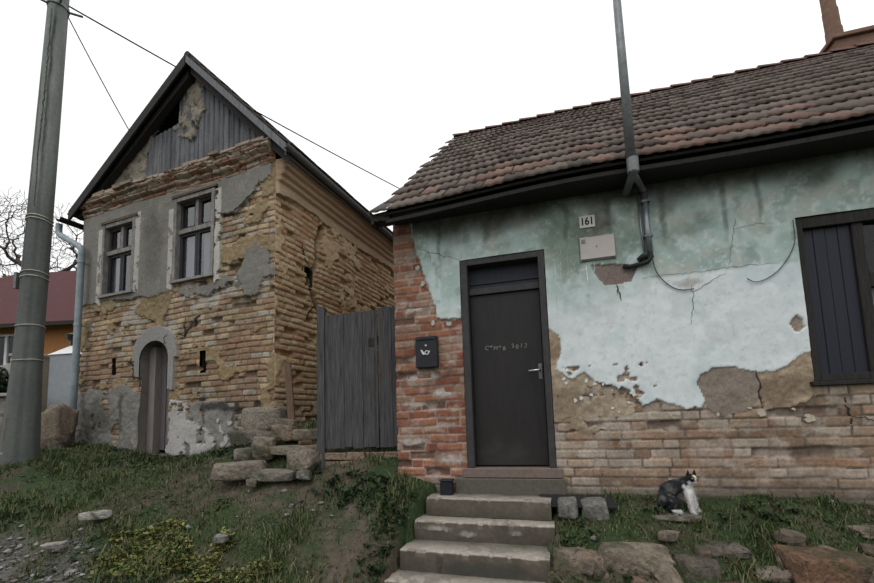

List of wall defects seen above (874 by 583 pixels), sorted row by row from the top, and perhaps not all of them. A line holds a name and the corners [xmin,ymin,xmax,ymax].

spalling [173,79,207,141]
spalling [111,127,159,188]
spalling [592,264,639,286]
crack [646,219,769,323]
spalling [75,162,468,492]
spalling [790,315,805,332]
spalling [549,330,874,505]